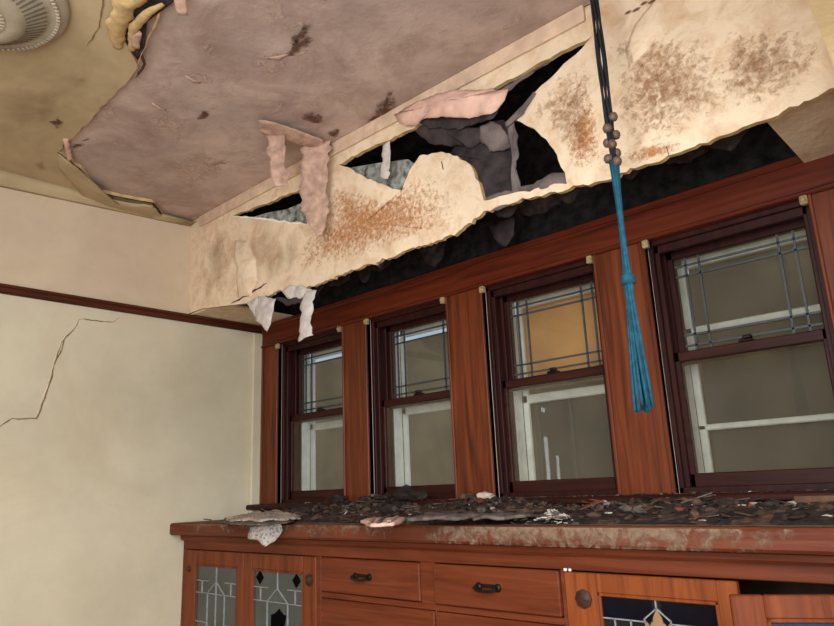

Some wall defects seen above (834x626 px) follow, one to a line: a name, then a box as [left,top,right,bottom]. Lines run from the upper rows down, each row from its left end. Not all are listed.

crack [87,0,104,45]
spalling [57,0,590,236]
damp [551,84,586,142]
damp [630,45,701,118]
damp [734,44,798,90]
crack [0,319,116,427]